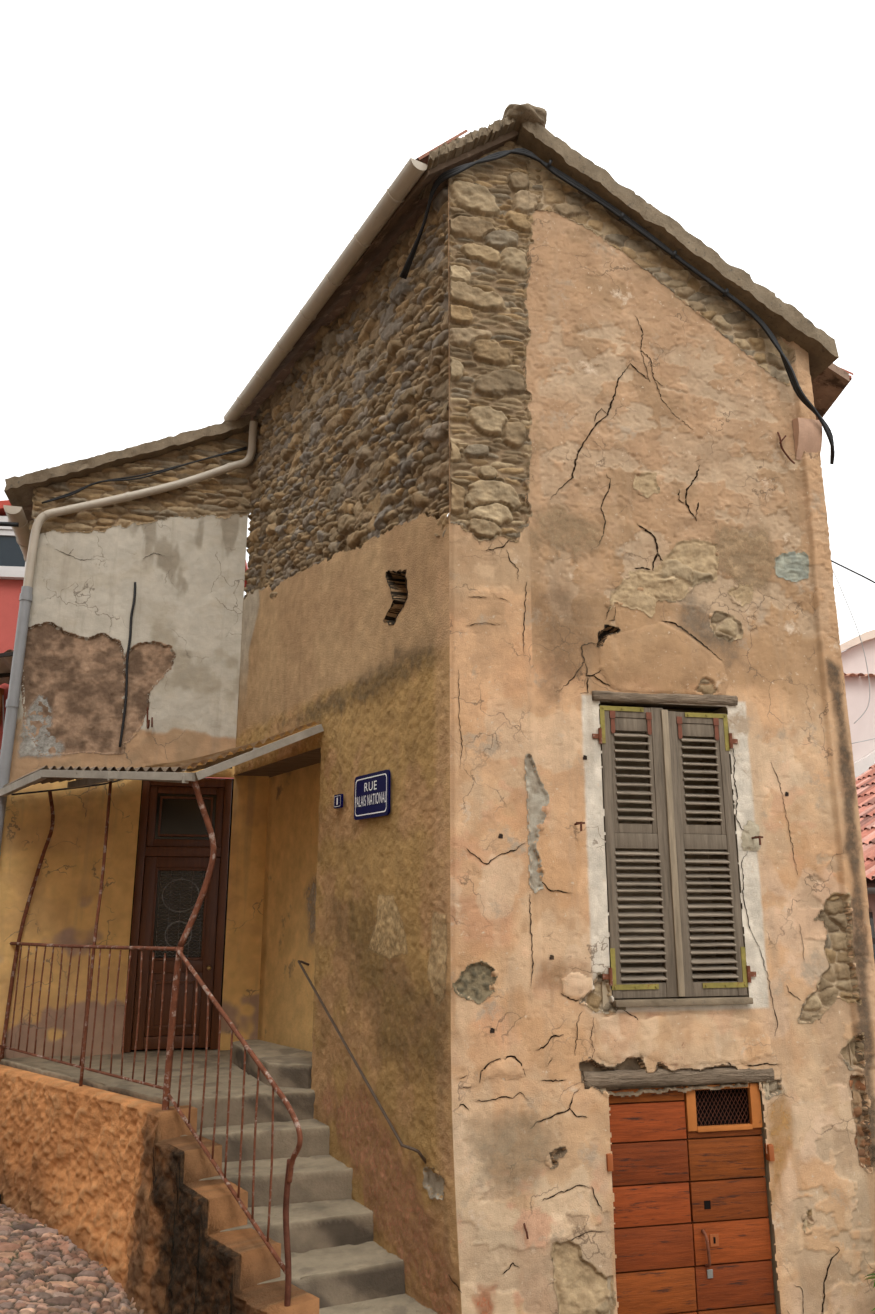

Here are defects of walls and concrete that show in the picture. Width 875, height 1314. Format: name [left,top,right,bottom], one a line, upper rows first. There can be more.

crack [554,317,690,495]
crack [594,474,611,548]
crack [635,525,663,570]
spalling [597,539,754,647]
crack [678,465,700,521]
flaking render [21,622,176,756]
spalling [524,754,549,893]
spalling [452,961,499,1004]
spalling [798,892,862,1024]
spalling [839,1032,873,1174]
crack [788,1247,840,1314]